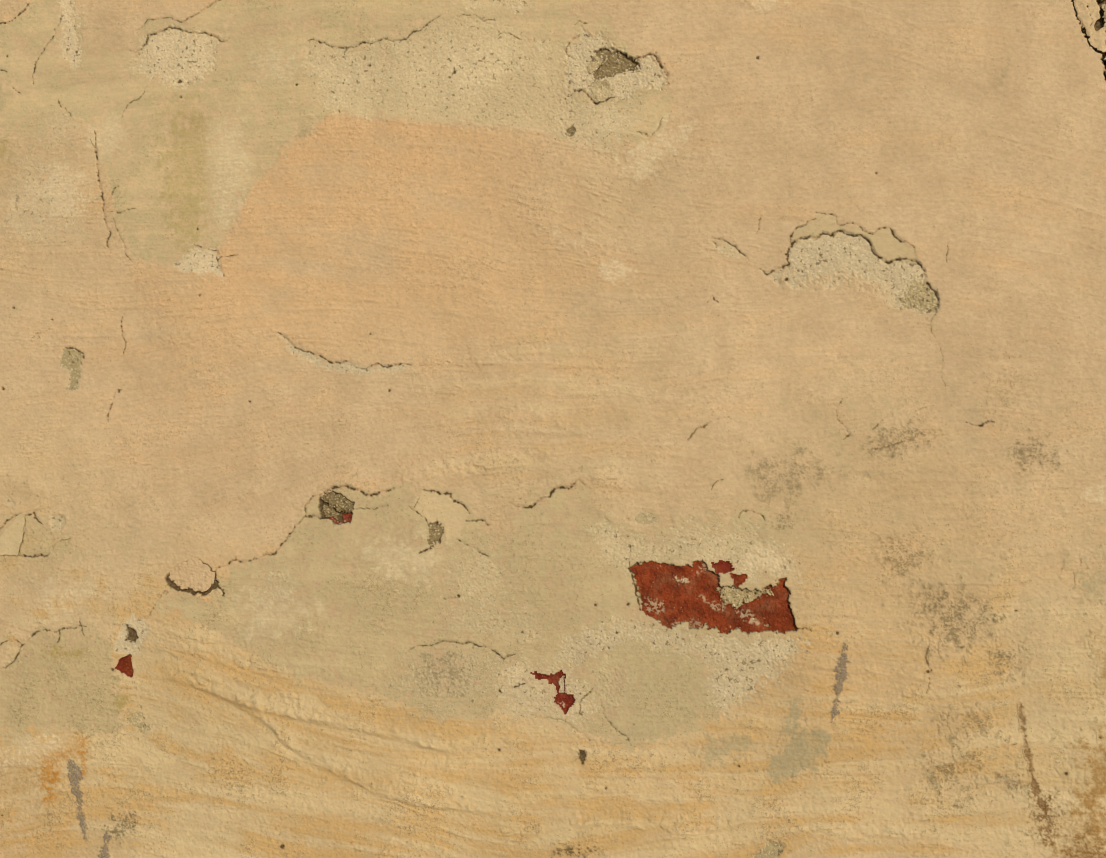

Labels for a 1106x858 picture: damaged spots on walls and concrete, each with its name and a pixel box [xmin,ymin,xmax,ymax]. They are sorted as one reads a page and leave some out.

spalling [1071,0,1106,80]
peeling [0,0,673,282]
spalling [757,211,948,321]
crack [5,512,68,557]
crack [215,486,391,572]
crack [416,489,488,556]
crack [524,483,575,508]
peeling [0,476,827,764]